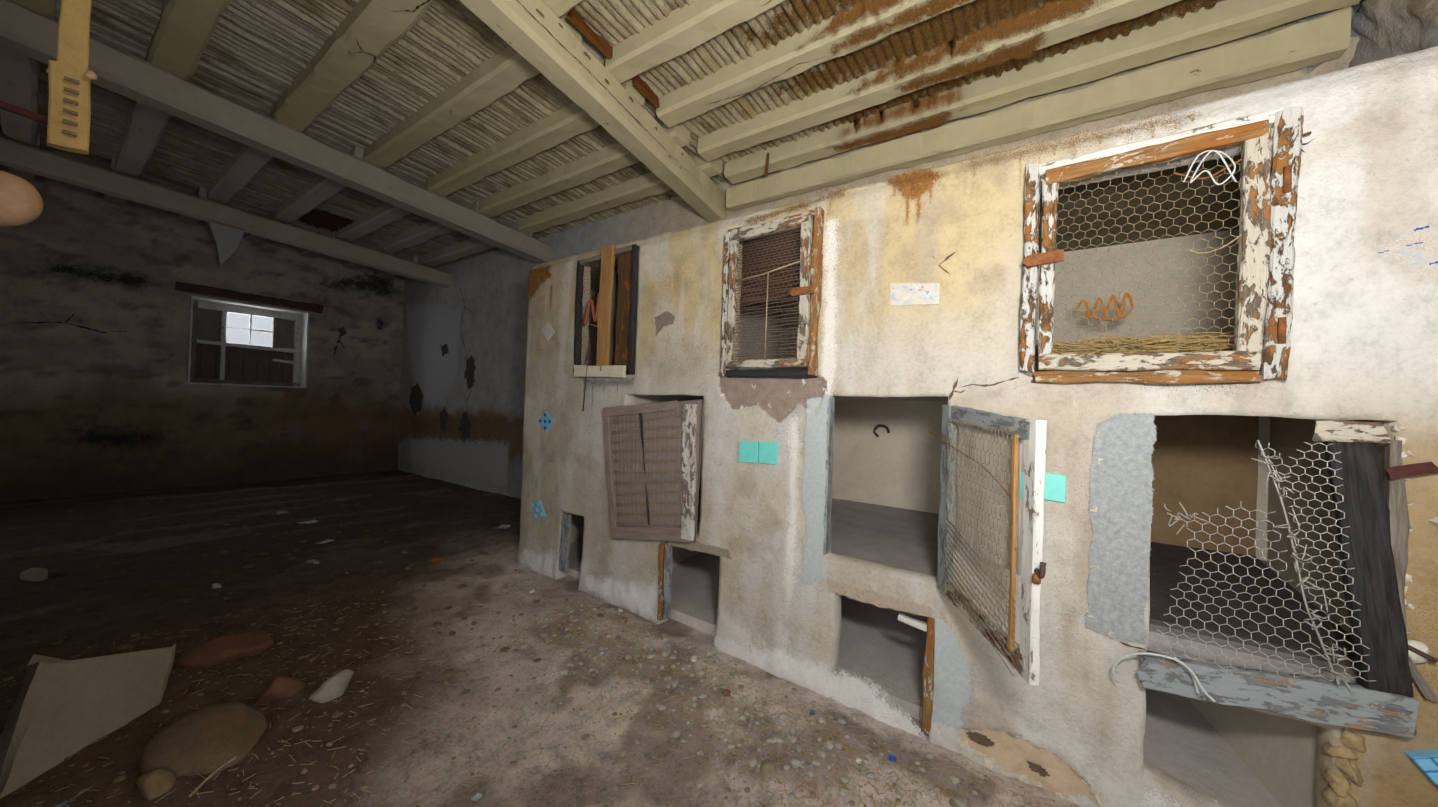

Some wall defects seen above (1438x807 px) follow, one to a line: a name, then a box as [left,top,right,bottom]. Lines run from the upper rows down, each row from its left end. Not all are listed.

corrosion [793,0,972,60]
corrosion [828,0,1102,152]
corrosion [883,165,950,226]
spalling [439,344,476,390]
peeling [718,372,1104,807]